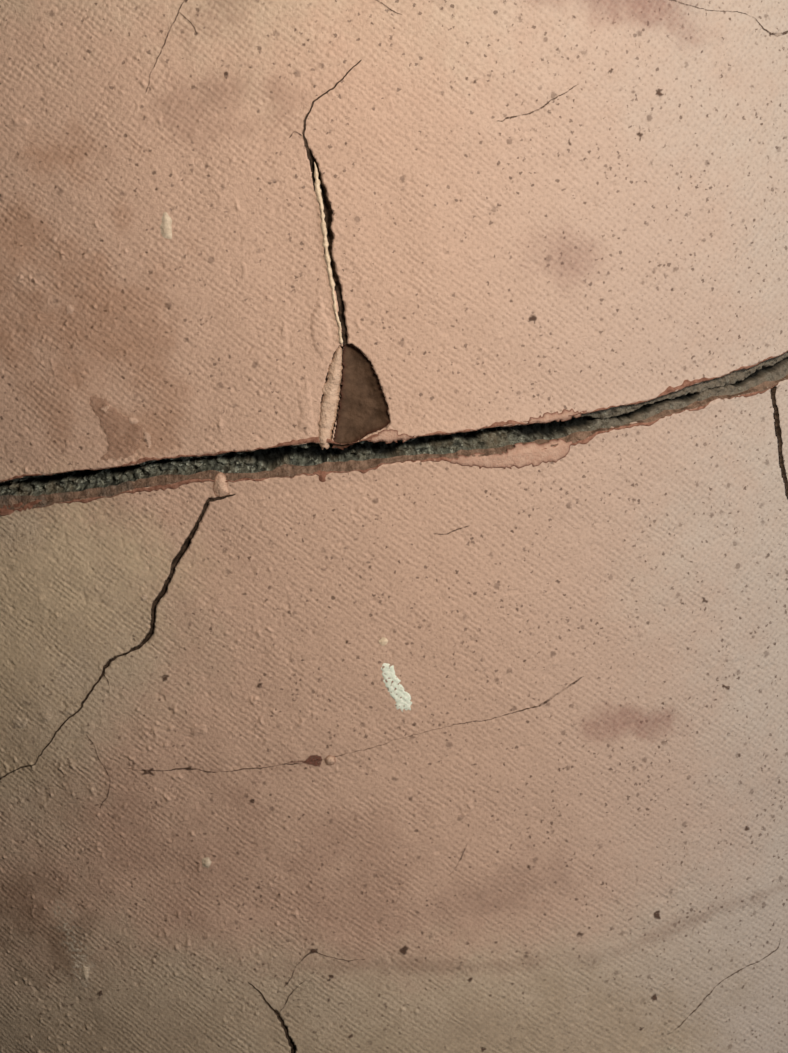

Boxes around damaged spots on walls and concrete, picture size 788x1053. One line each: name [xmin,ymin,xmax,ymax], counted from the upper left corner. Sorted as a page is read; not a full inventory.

crack [146,2,197,92]
crack [671,0,787,36]
crack [289,60,361,345]
peeling [318,344,391,450]
crack [0,351,788,808]
crack [248,952,365,1053]
crack [678,939,781,1028]